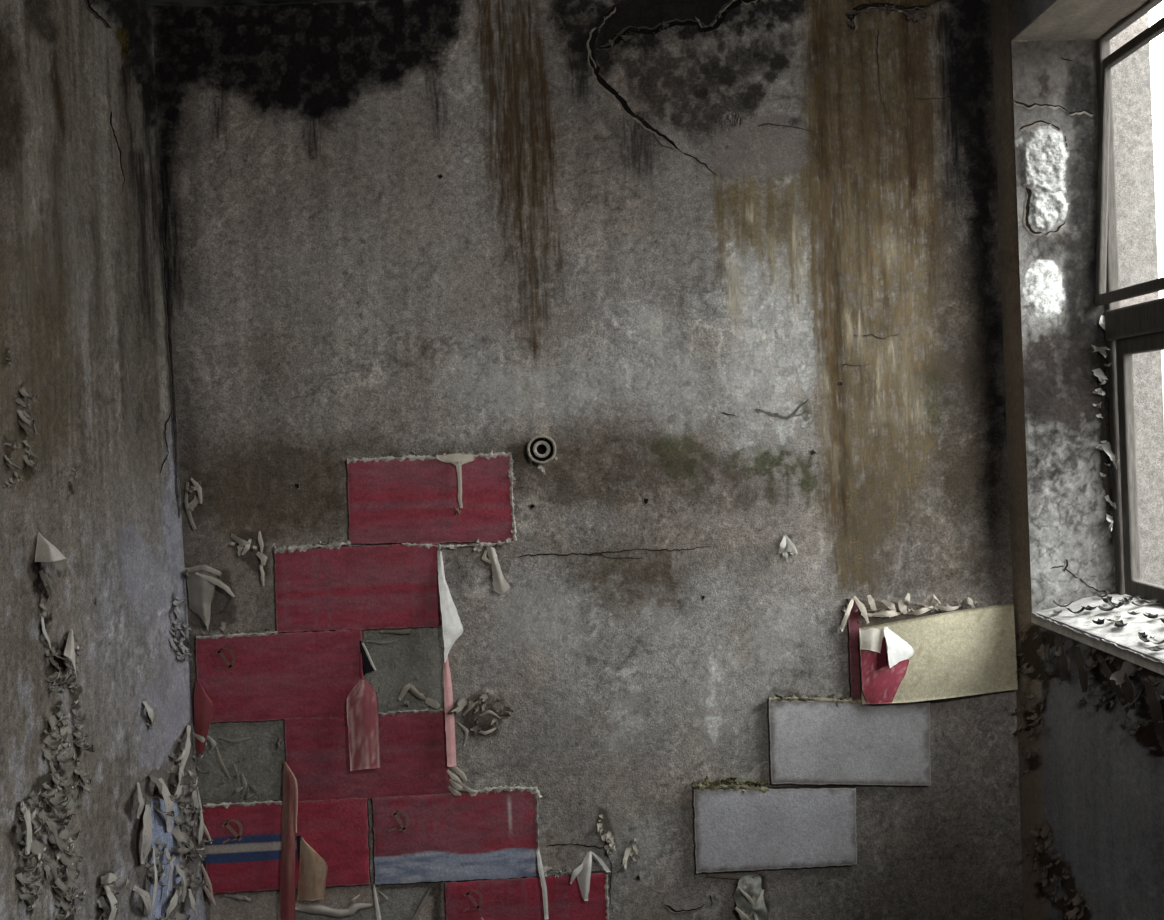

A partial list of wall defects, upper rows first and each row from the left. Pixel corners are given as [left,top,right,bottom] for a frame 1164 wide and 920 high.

damp [90,0,462,470]
crack [586,6,717,175]
damp [552,0,807,173]
crack [695,0,765,33]
crack [758,123,814,133]
rust [805,0,943,592]
spalling [1016,124,1069,233]
damp [509,438,779,505]
crack [512,546,712,559]
peeling [12,531,283,920]
peeling [1015,623,1164,775]
peeling [295,882,446,920]